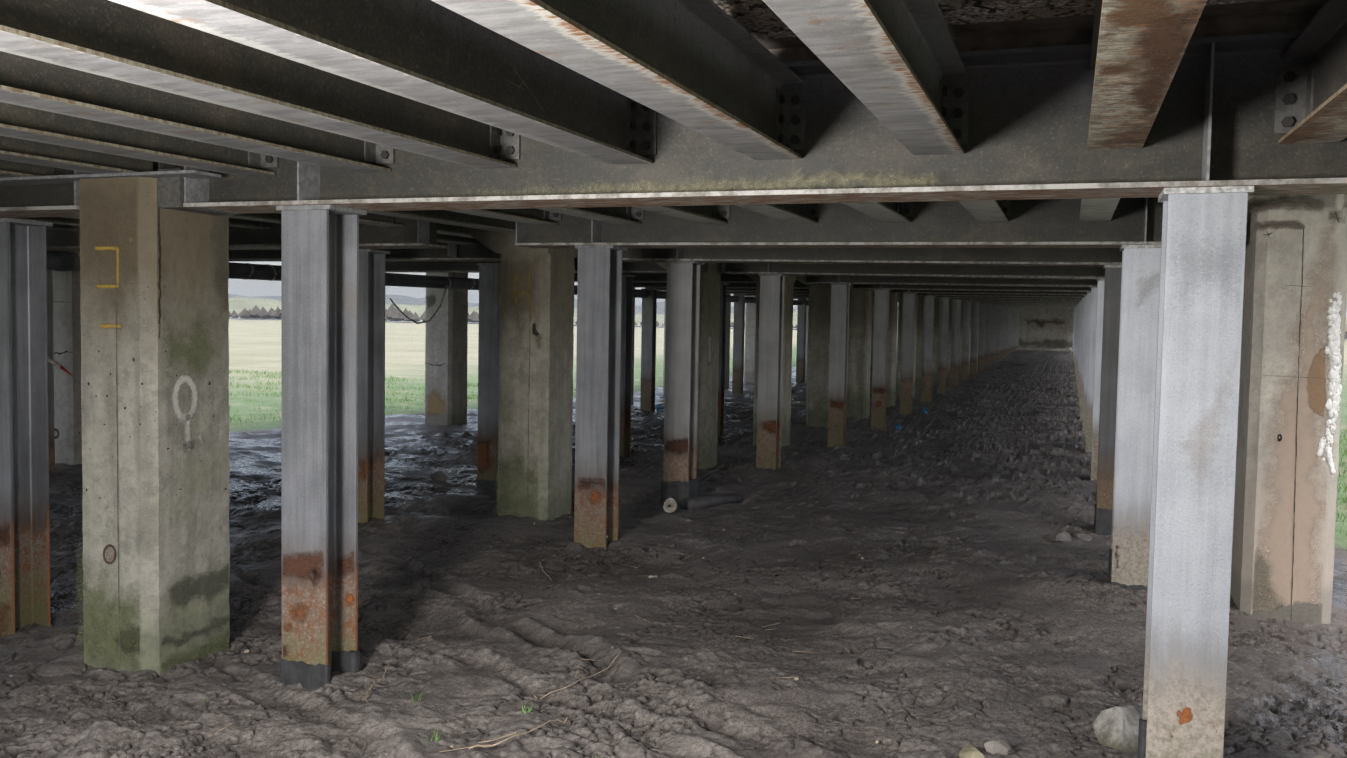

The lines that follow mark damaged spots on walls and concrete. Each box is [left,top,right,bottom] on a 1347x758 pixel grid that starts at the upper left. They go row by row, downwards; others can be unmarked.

rust [1100,0,1195,115]
rust [665,438,688,454]
leakage [169,566,229,605]
rust [283,552,323,584]
leakage [162,617,229,667]
rust [1171,707,1193,738]